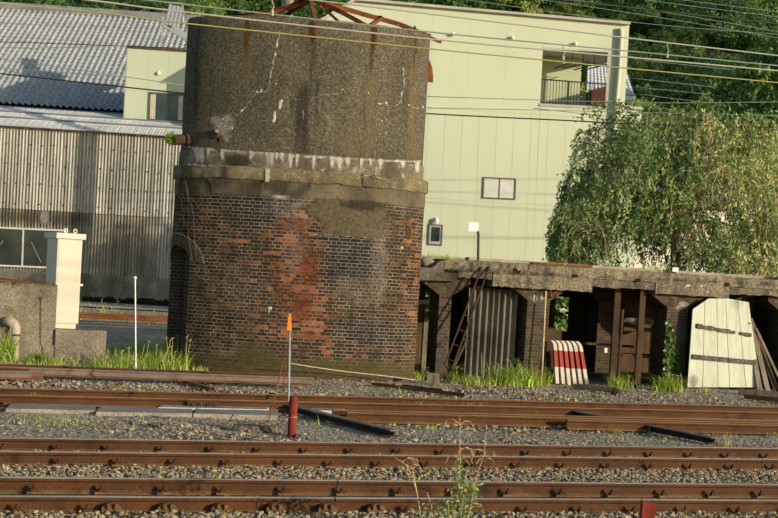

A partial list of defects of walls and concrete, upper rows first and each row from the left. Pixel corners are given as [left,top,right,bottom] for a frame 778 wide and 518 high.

crack [236,31,281,116]
crack [324,68,424,124]
spalling [210,114,234,143]